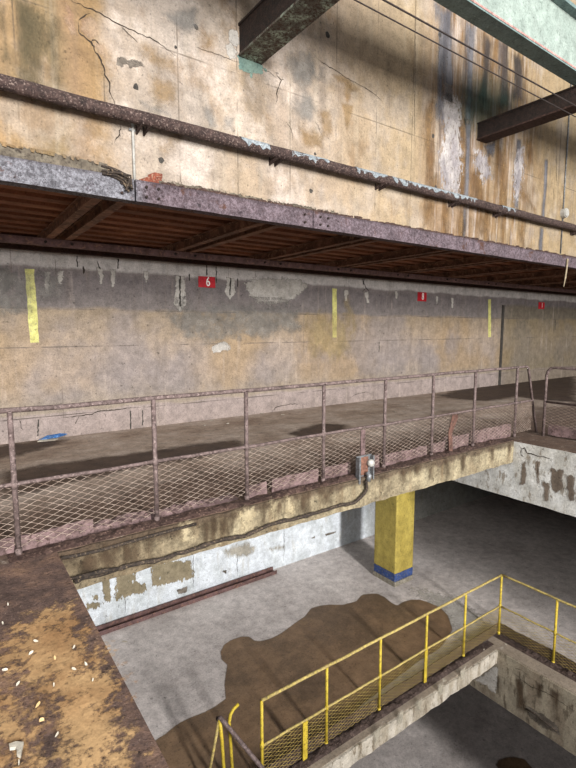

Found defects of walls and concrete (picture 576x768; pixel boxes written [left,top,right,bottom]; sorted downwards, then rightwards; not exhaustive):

crack [74,2,176,104]
spalling [117,57,142,69]
water stain [433,4,522,196]
spalling [0,141,108,173]
corrosion [425,100,437,187]
corrosion [453,114,483,200]
water stain [512,140,525,208]
spalling [212,341,231,353]
peeling [86,560,195,611]
peeling [225,543,254,556]
corrosion [0,601,139,768]
water stain [155,587,491,768]